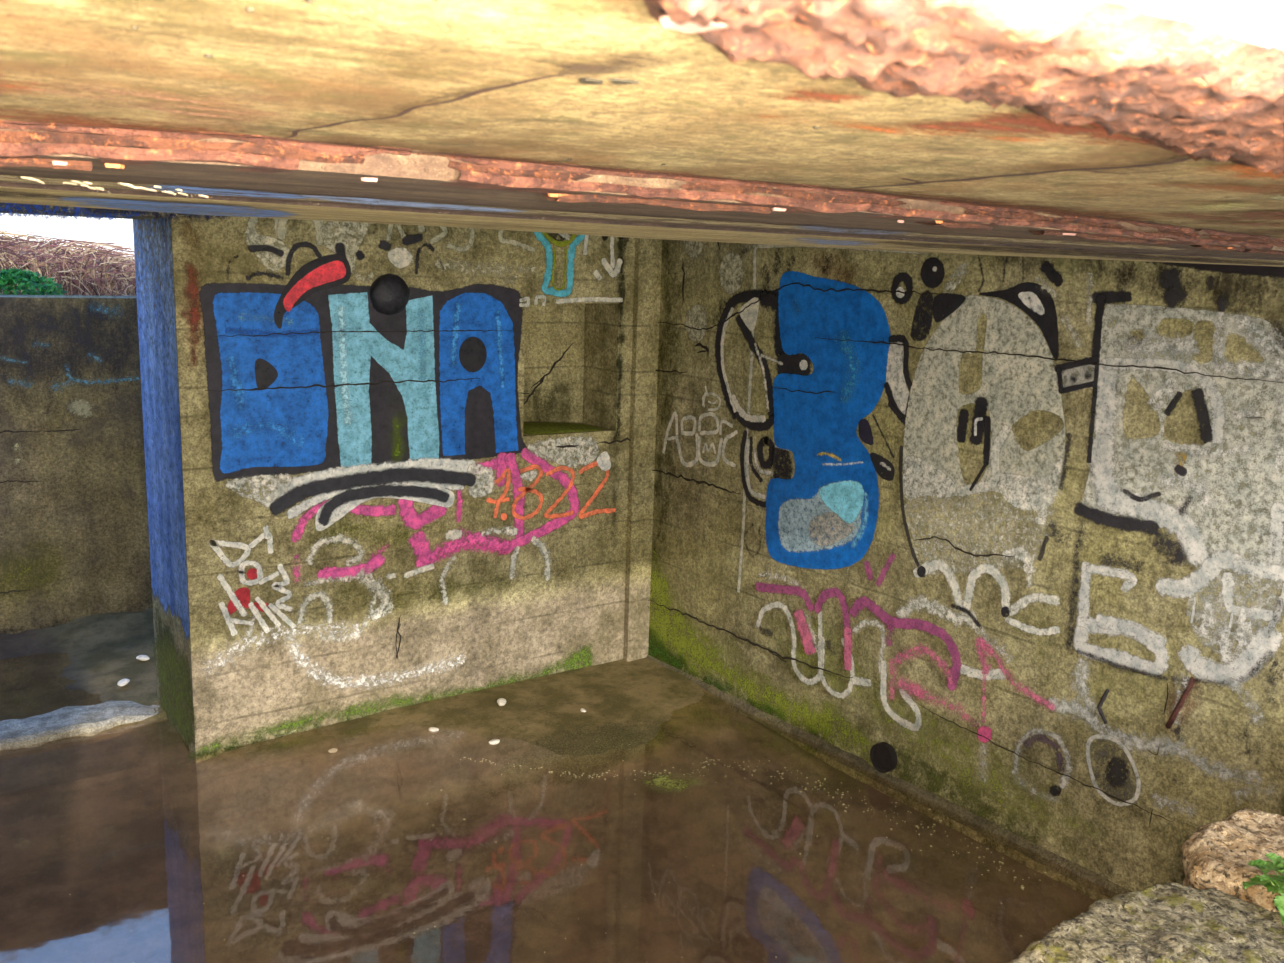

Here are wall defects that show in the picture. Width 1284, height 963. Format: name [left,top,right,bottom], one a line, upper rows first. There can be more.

corrosion [0,75,1284,255]
crack [2,72,1284,238]